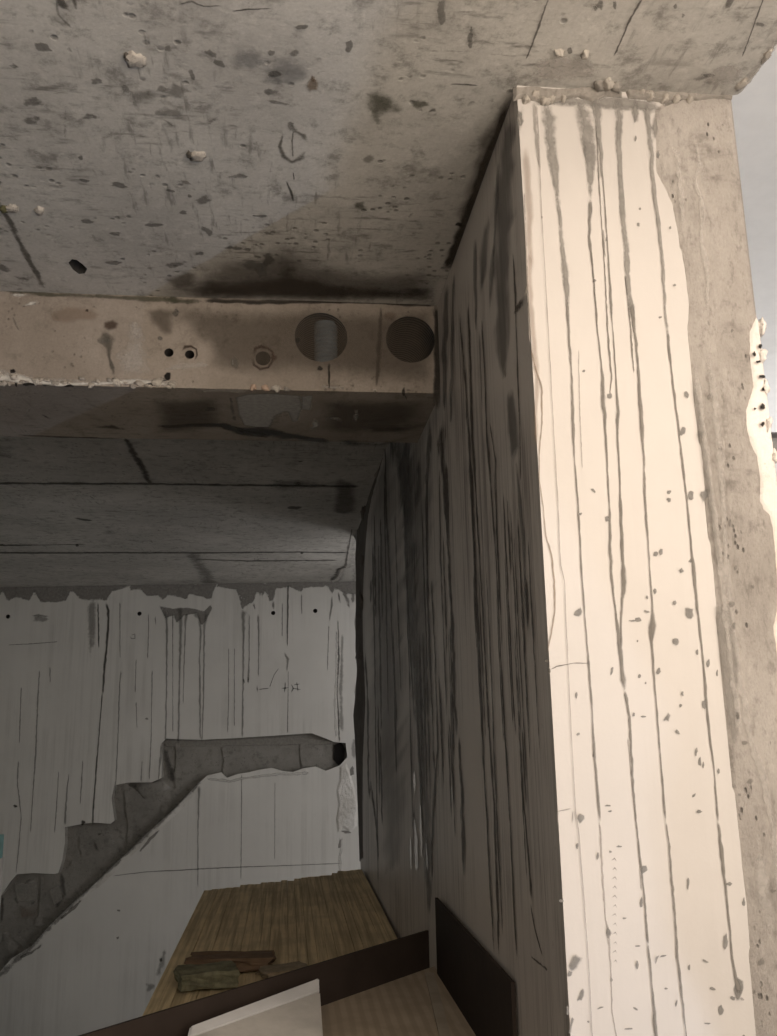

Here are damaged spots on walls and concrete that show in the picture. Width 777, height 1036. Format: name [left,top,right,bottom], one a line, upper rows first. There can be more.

crack [614,0,642,55]
crack [742,0,763,56]
water stain [372,95,392,113]
crack [0,206,42,284]
spalling [0,369,176,389]
flaking render [746,316,777,568]
water stain [0,110,539,950]
water stain [532,97,740,1036]
spalling [0,458,383,975]